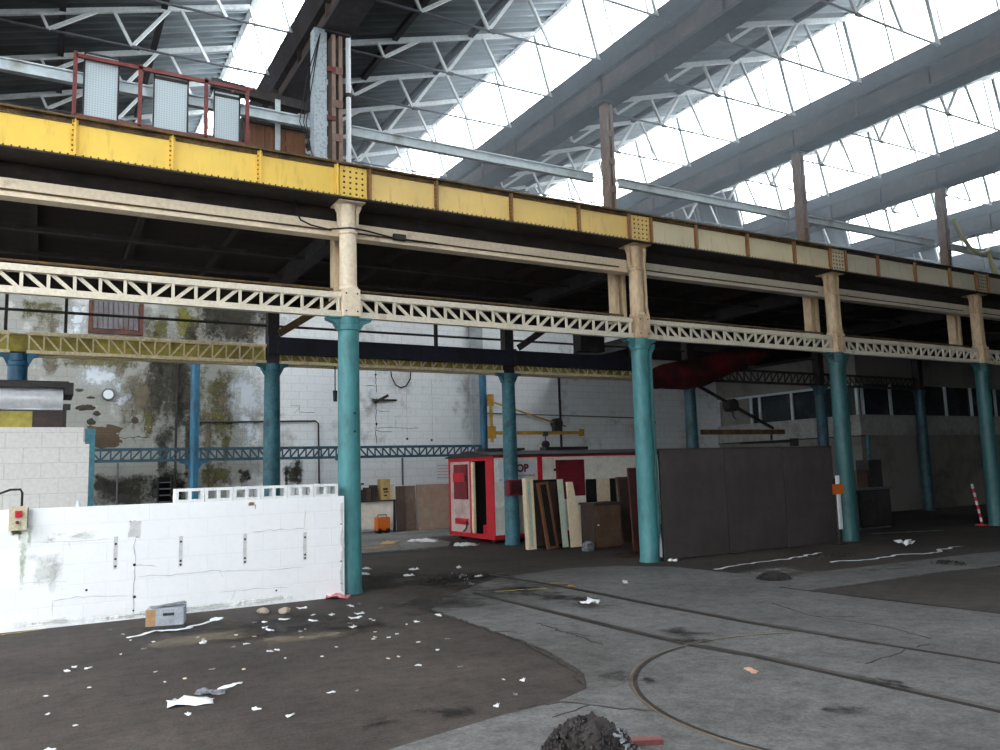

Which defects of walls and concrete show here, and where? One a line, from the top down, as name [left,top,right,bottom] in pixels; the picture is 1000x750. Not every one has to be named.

damp [45,358,57,373]
damp [145,315,168,338]
damp [184,308,266,343]
spalling [75,365,151,448]
damp [93,361,231,506]
crack [23,538,298,617]